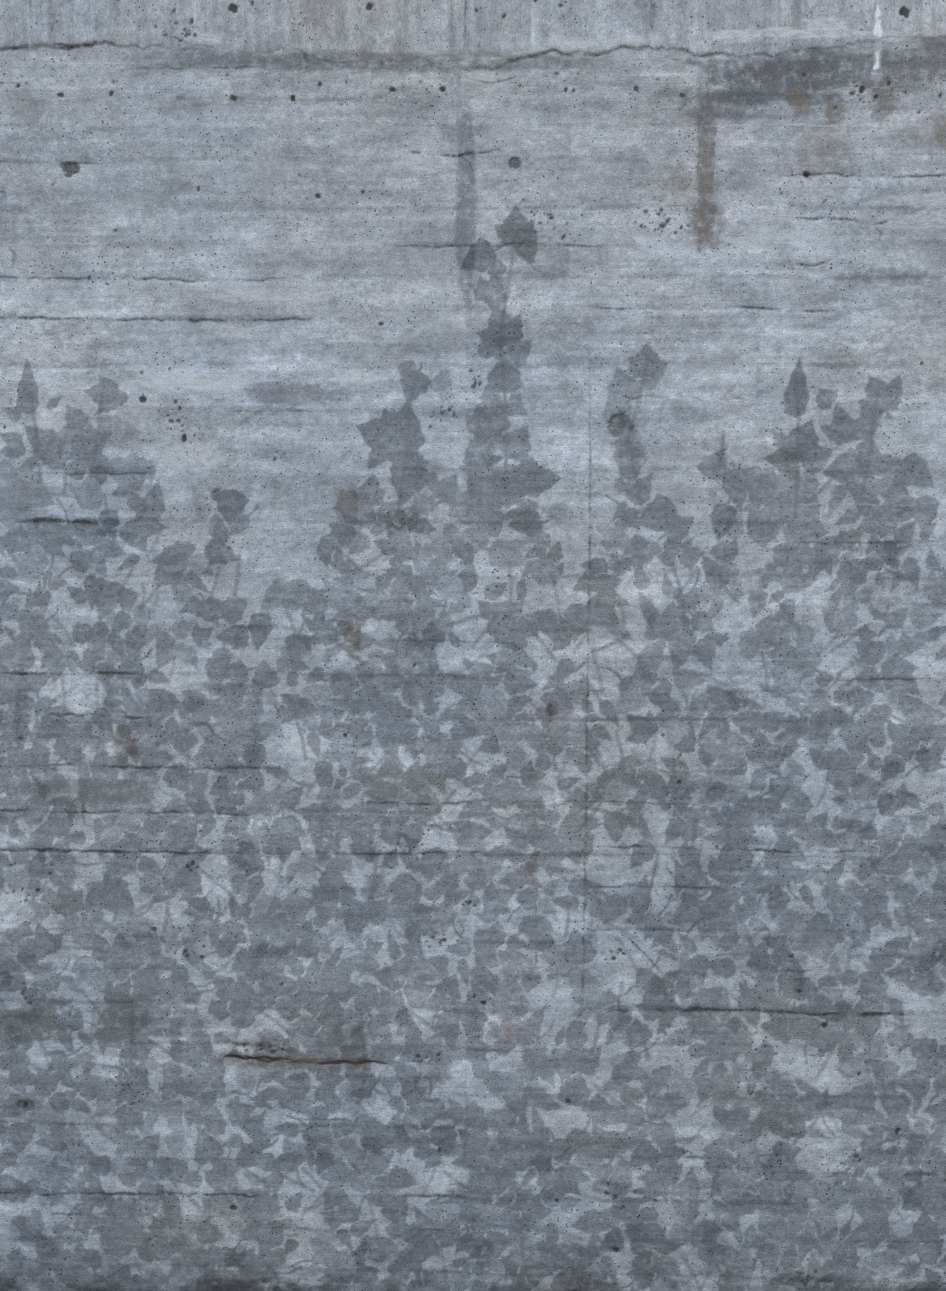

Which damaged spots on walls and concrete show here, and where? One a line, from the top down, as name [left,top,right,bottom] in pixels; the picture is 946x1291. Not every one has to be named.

rust [695,105,716,241]